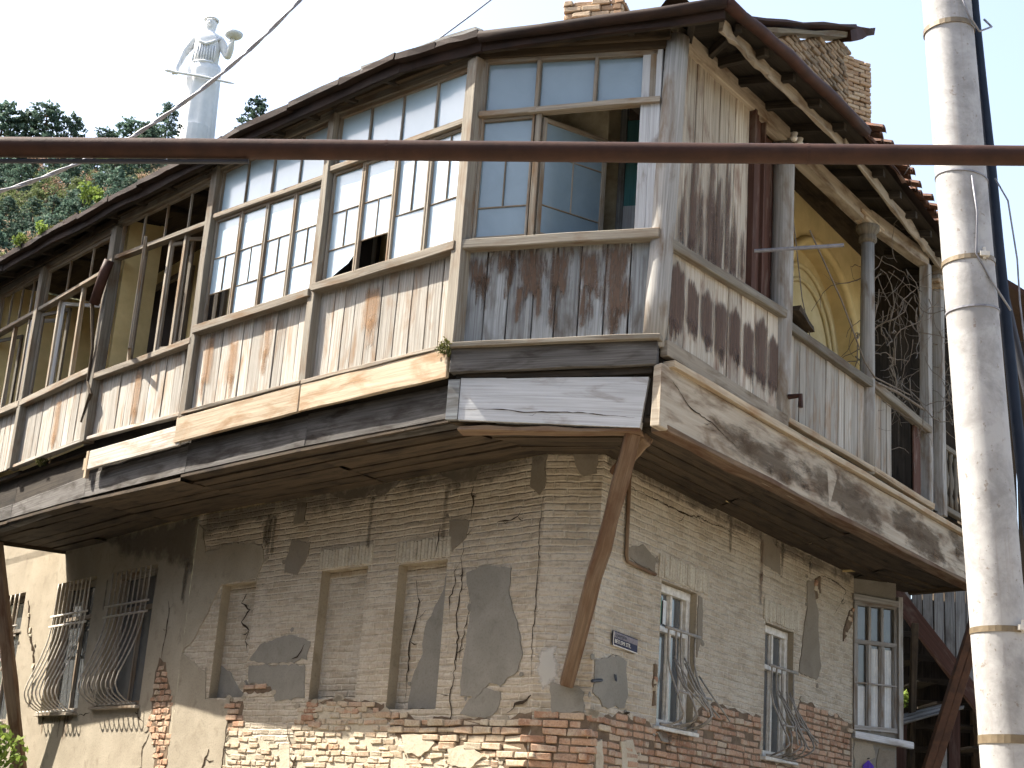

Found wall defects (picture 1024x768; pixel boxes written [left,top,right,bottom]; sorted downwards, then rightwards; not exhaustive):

crack [241,594,253,649]
crack [405,580,424,697]
crack [435,486,476,760]
crack [497,496,544,713]
flaking render [143,658,174,768]
flaking render [222,680,855,768]